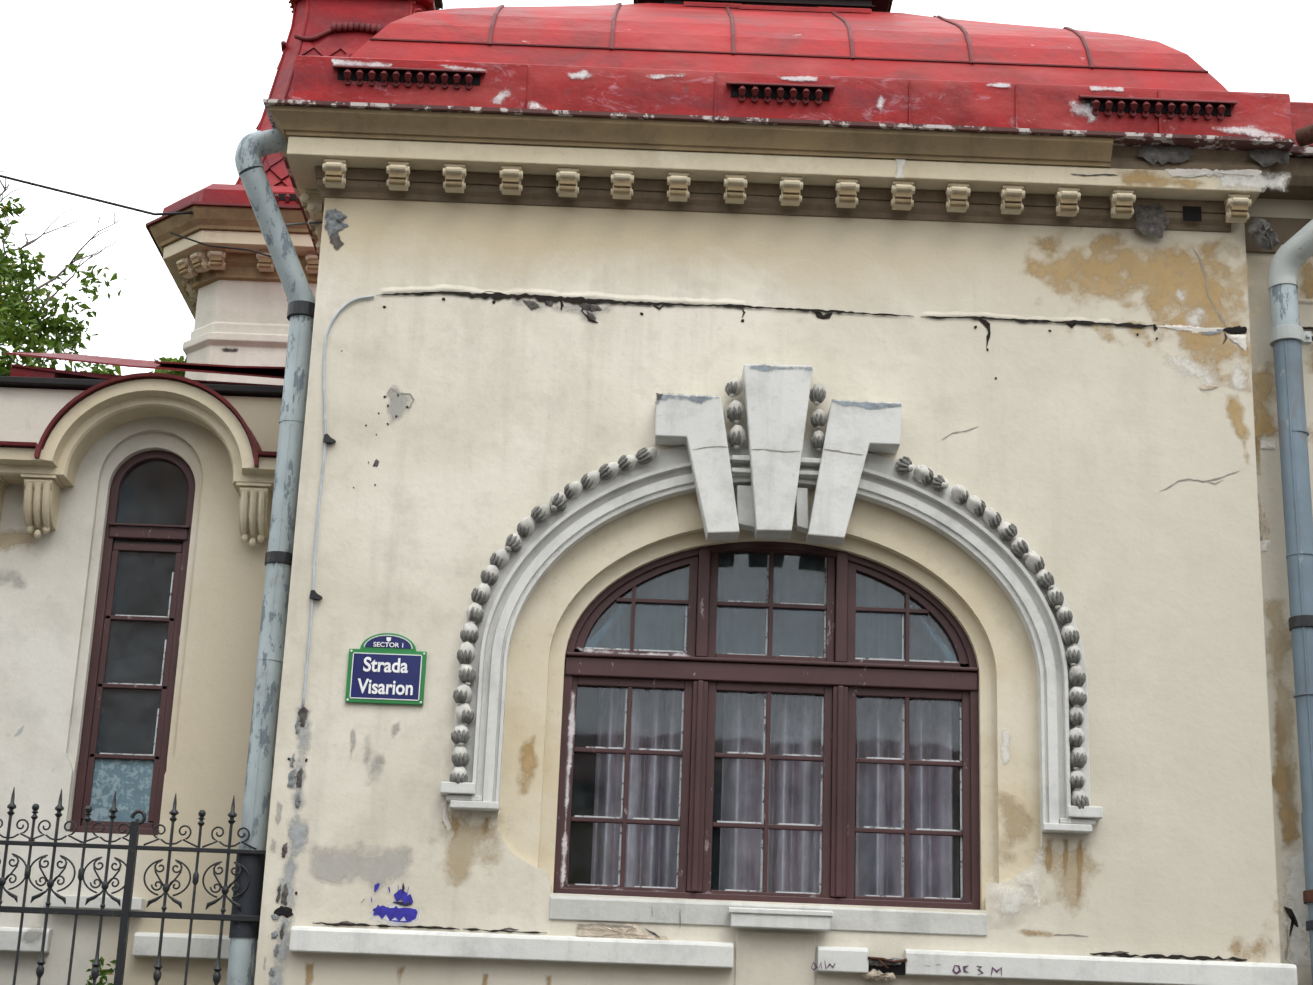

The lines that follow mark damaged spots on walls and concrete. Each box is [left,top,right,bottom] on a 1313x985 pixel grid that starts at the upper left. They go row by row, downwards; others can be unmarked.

peeling [332,59,391,67]
crack [379,284,1158,379]
spalling [1202,326,1247,351]
peeling [365,388,414,435]
crack [1161,471,1239,491]
damp [1267,601,1298,843]
spalling [264,707,309,985]